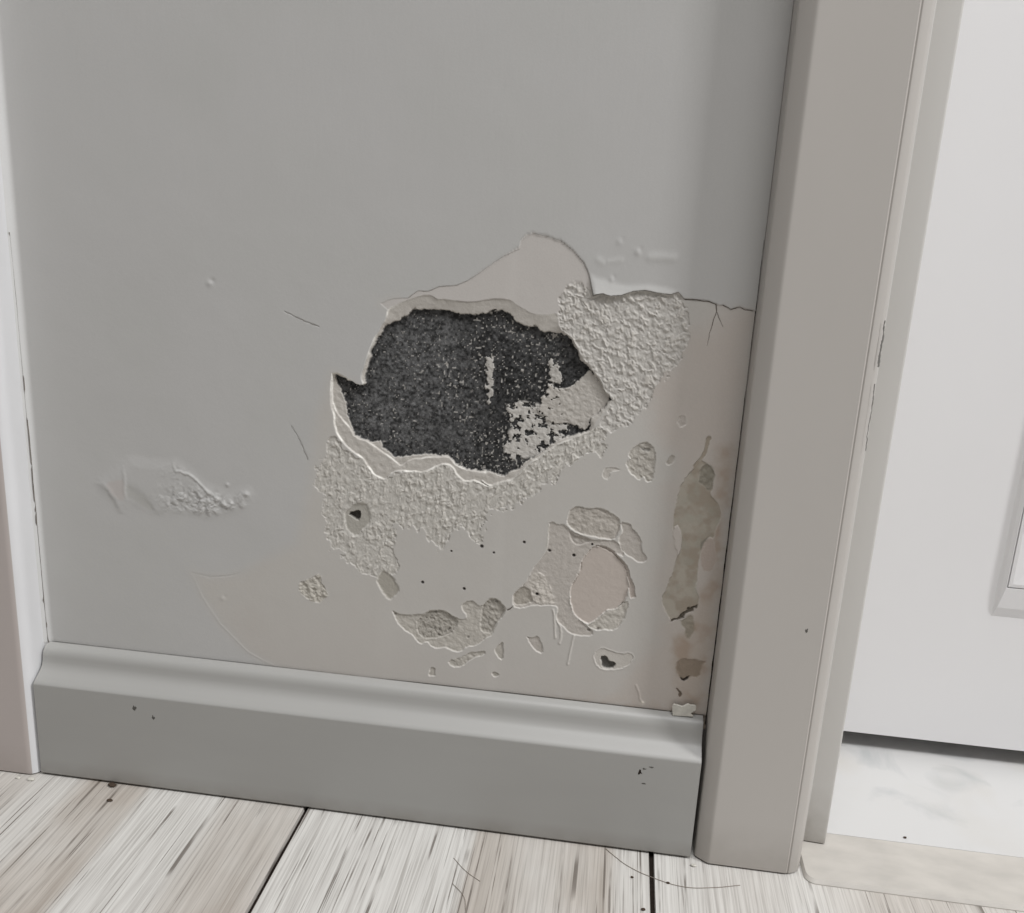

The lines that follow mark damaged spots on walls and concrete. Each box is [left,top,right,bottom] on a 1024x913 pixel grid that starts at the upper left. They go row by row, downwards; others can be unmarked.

spalling [345,503,371,536]
spalling [331,295,612,486]
flaking render [377,506,647,670]
crack [534,233,764,724]
peeling [590,272,754,639]
leakage [593,299,757,729]